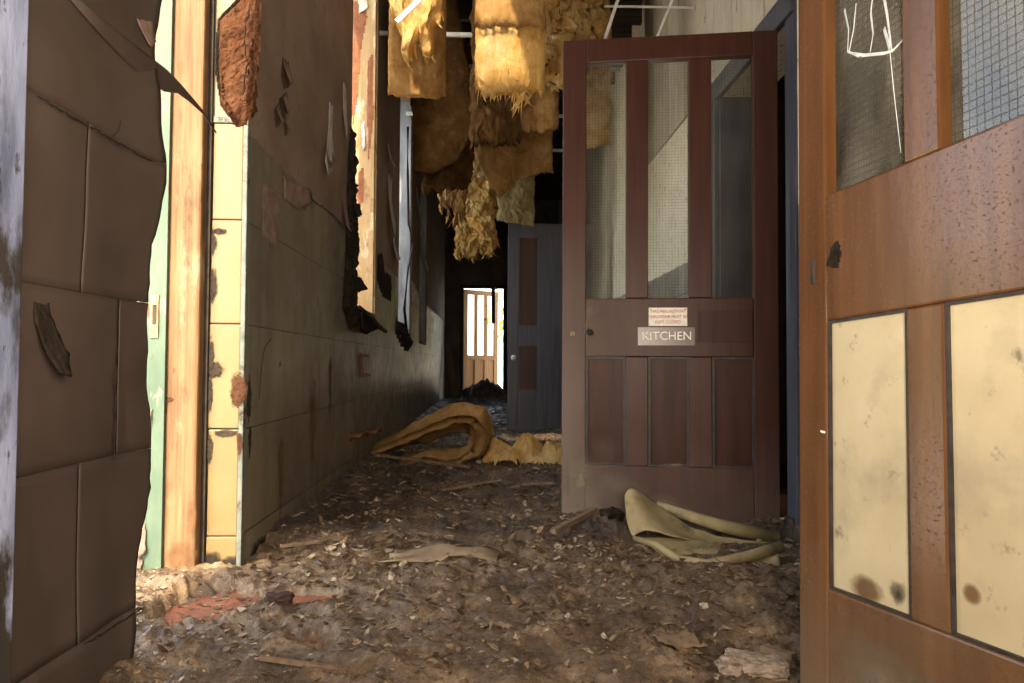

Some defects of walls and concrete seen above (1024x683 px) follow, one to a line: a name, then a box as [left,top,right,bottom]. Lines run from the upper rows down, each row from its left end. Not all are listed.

peeling [70,0,217,133]
spalling [215,0,262,127]
peeling [274,56,294,136]
spalling [325,0,413,351]
peeling [137,524,146,570]
leakage [855,578,878,601]
leakage [892,585,903,601]
leakage [965,586,979,603]